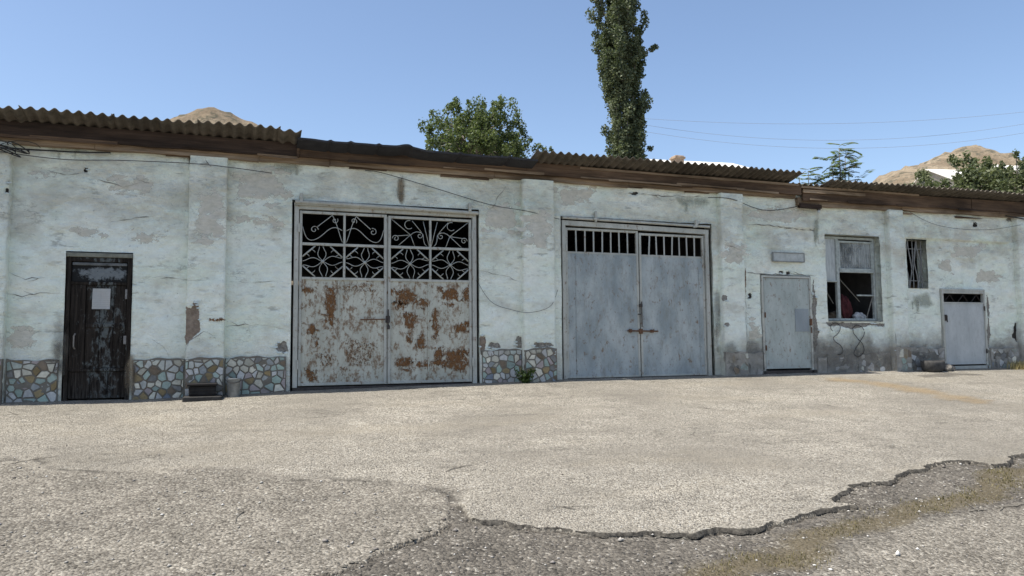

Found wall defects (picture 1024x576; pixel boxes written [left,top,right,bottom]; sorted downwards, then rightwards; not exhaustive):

spalling [184,300,202,345]
rust [302,283,473,382]